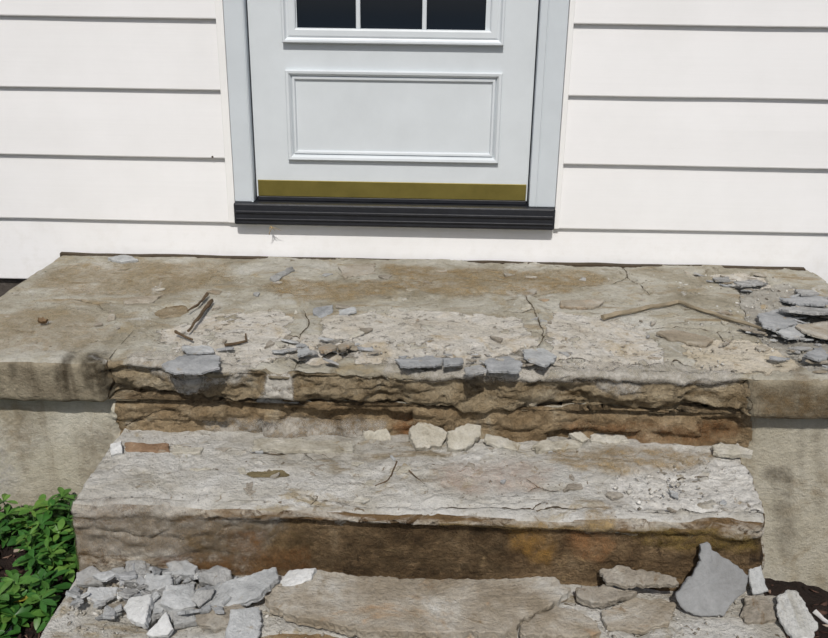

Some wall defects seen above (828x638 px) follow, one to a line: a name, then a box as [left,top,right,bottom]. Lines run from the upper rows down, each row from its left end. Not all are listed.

crack [508,297,544,347]
spalling [105,272,828,448]
spalling [604,458,763,514]
peeling [0,538,45,582]
spalling [249,517,763,591]
peeling [51,574,68,611]
peeling [10,619,47,638]
peeling [806,601,828,638]